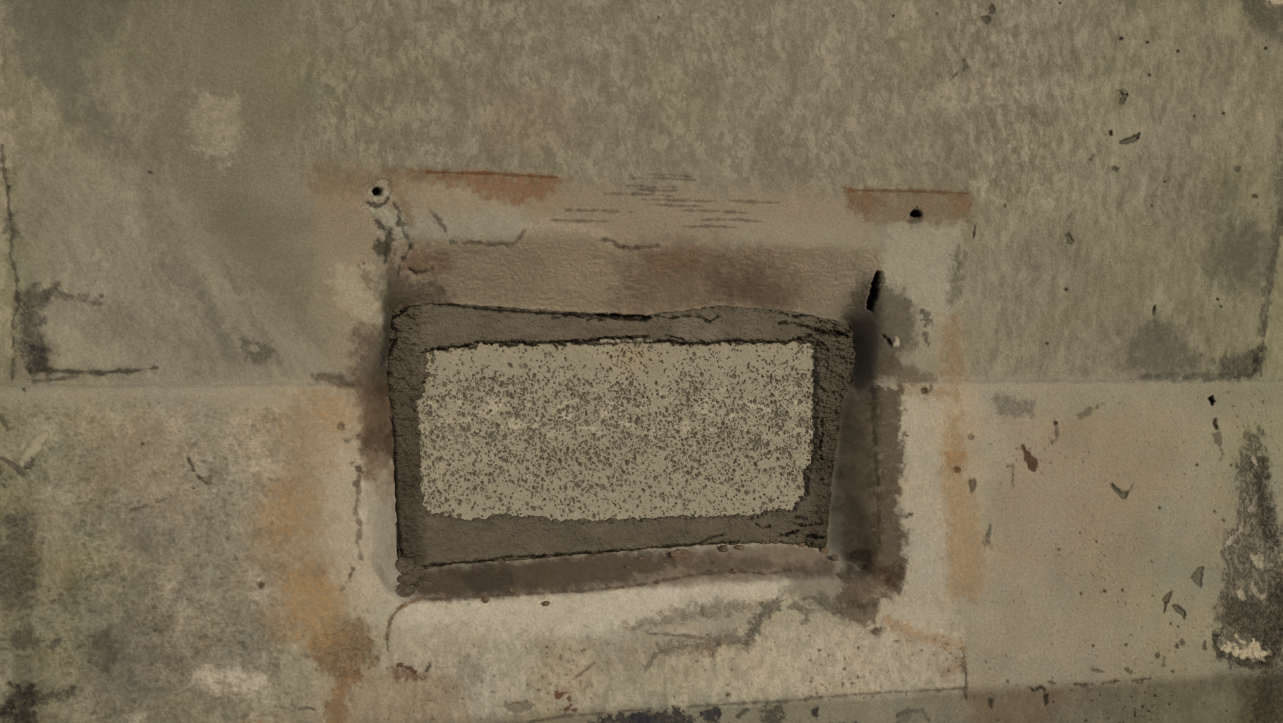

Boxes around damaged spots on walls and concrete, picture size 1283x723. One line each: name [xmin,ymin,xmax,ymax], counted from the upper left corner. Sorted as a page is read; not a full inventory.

corrosion [391,169,561,205]
corrosion [845,188,972,225]
water stain [417,282,932,658]
water stain [1212,427,1283,723]
water stain [0,683,76,723]